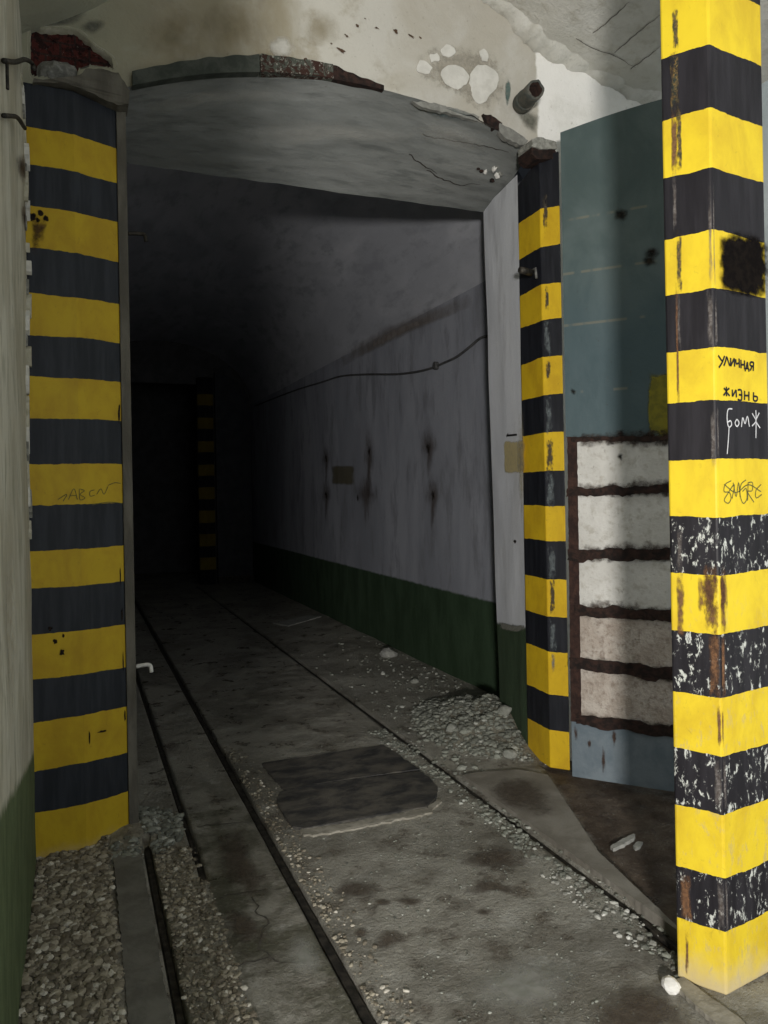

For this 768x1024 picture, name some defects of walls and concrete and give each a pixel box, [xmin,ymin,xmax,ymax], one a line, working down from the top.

crack [409,109,507,186]
peeling [411,44,557,169]
flaking render [20,26,118,539]
rust [698,569,728,692]